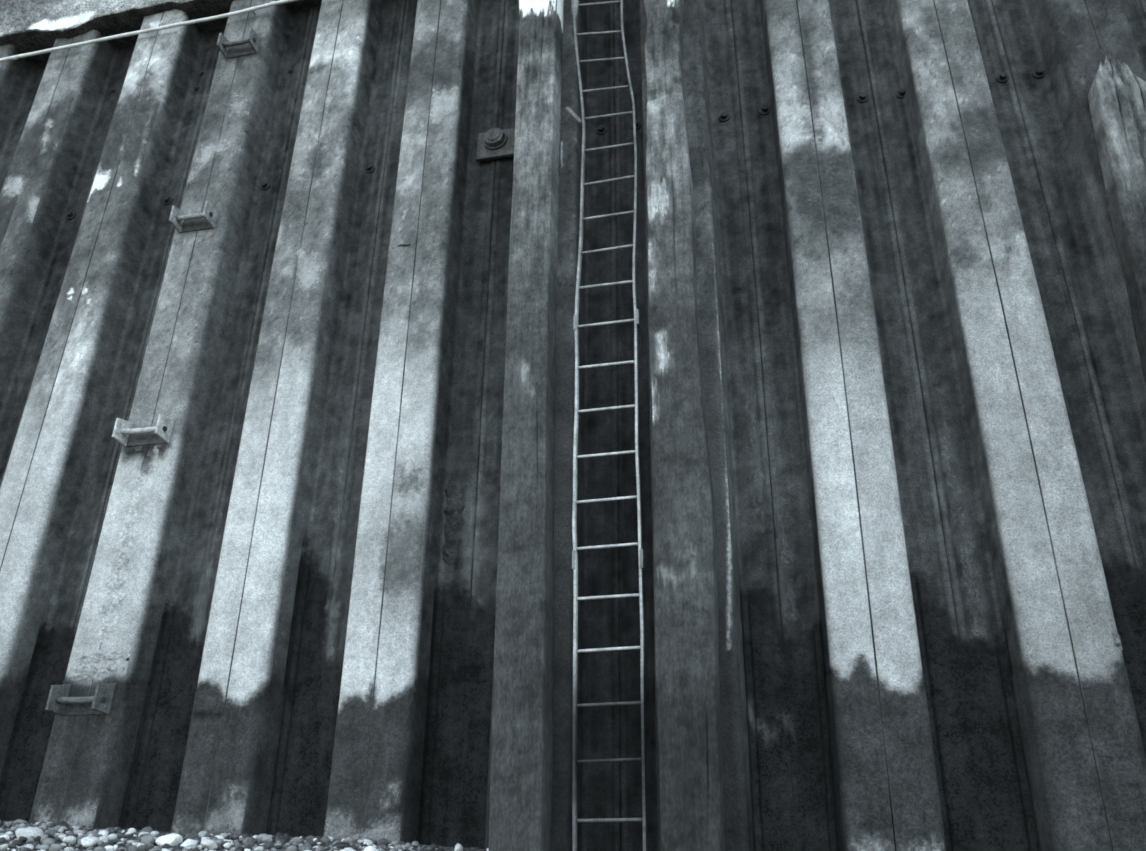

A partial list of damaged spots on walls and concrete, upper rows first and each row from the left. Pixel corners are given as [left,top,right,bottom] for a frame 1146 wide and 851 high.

leakage [0,675,27,776]
leakage [29,676,151,829]
leakage [171,681,286,836]
leakage [325,679,428,844]
leakage [825,654,946,851]
leakage [1011,660,1146,851]